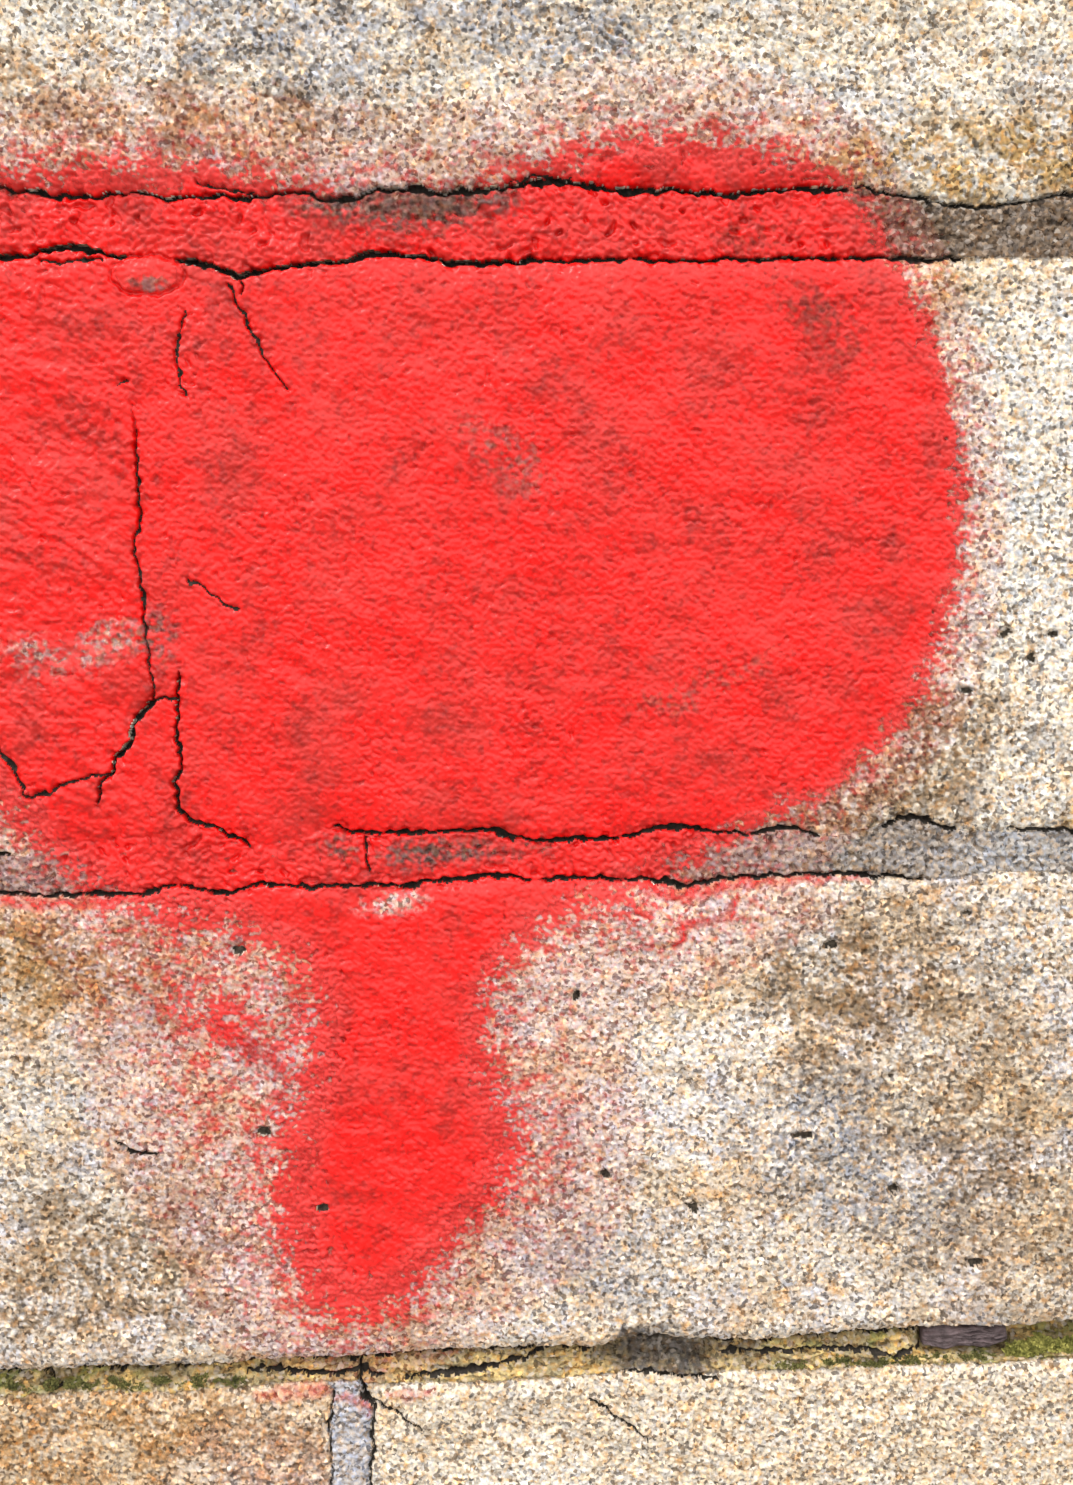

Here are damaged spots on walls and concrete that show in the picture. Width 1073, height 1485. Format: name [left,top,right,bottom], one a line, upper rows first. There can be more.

crack [175,310,188,396]
crack [0,429,251,847]
crack [0,823,922,899]
crack [881,813,956,831]
crack [1006,825,1073,834]